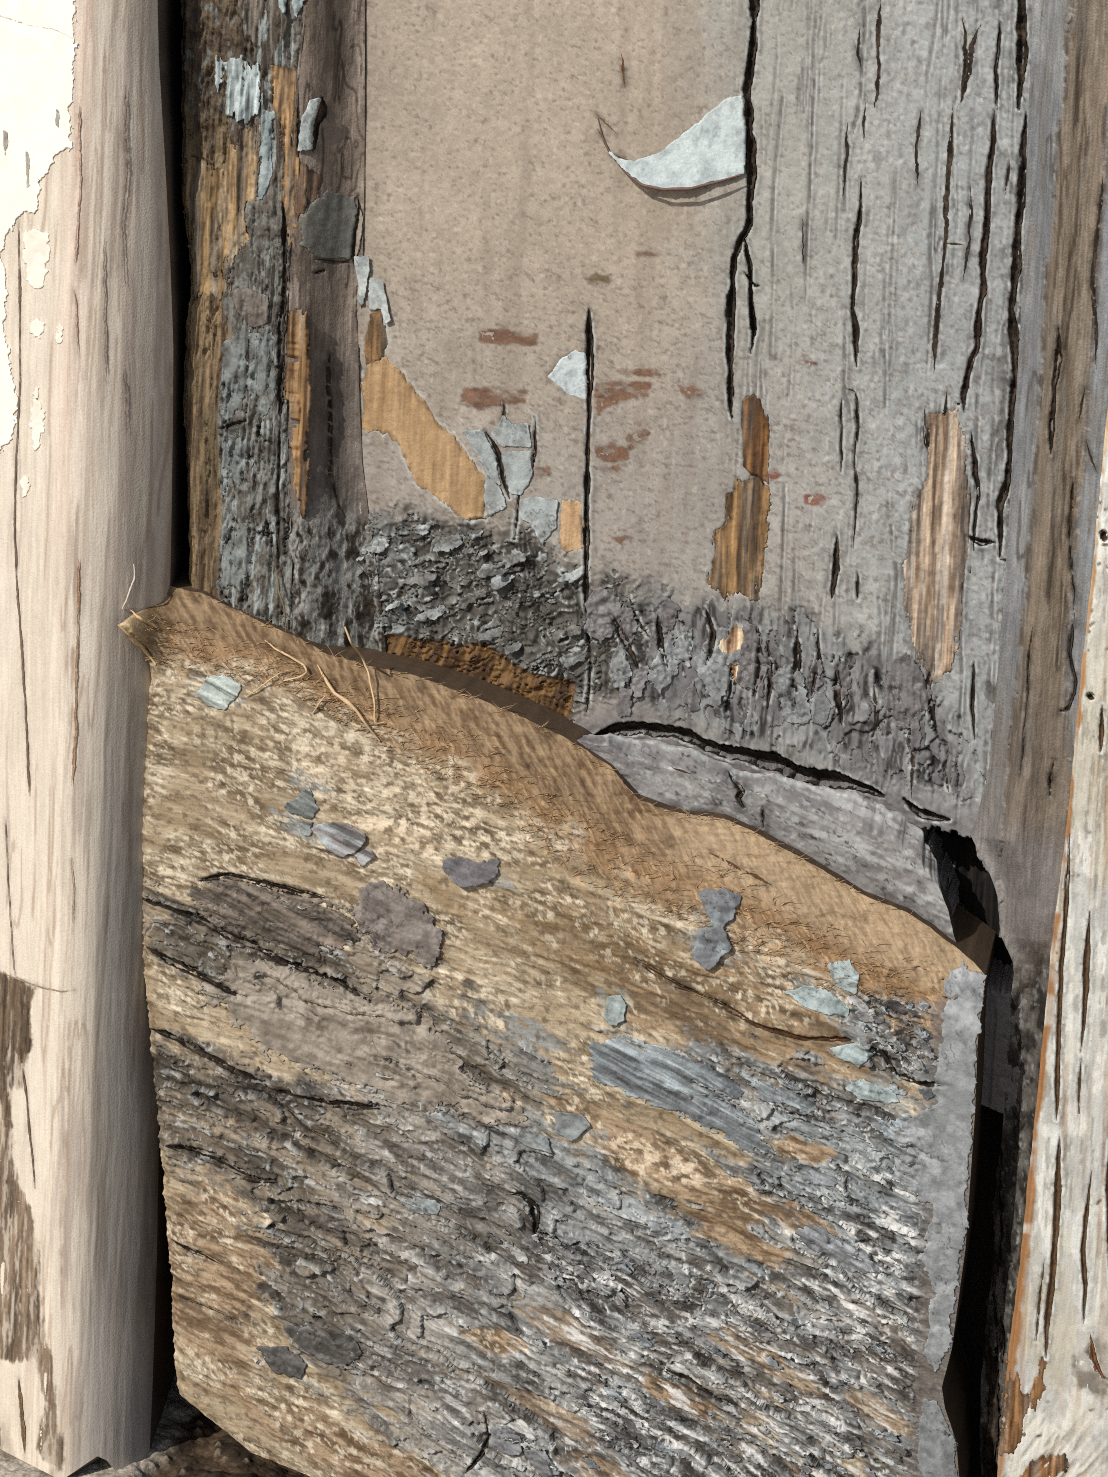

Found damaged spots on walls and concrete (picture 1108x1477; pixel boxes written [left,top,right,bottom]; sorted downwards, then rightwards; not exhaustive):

peeling [0,0,78,451]
peeling [180,55,590,622]
peeling [598,94,747,191]
peeling [706,394,771,602]
crack [582,0,986,826]
crack [914,0,1103,796]
peeling [187,789,590,1153]
crack [709,852,771,885]
crack [636,960,941,1087]
peeling [785,959,987,1372]
crack [983,833,1108,1477]
crack [663,1367,732,1407]